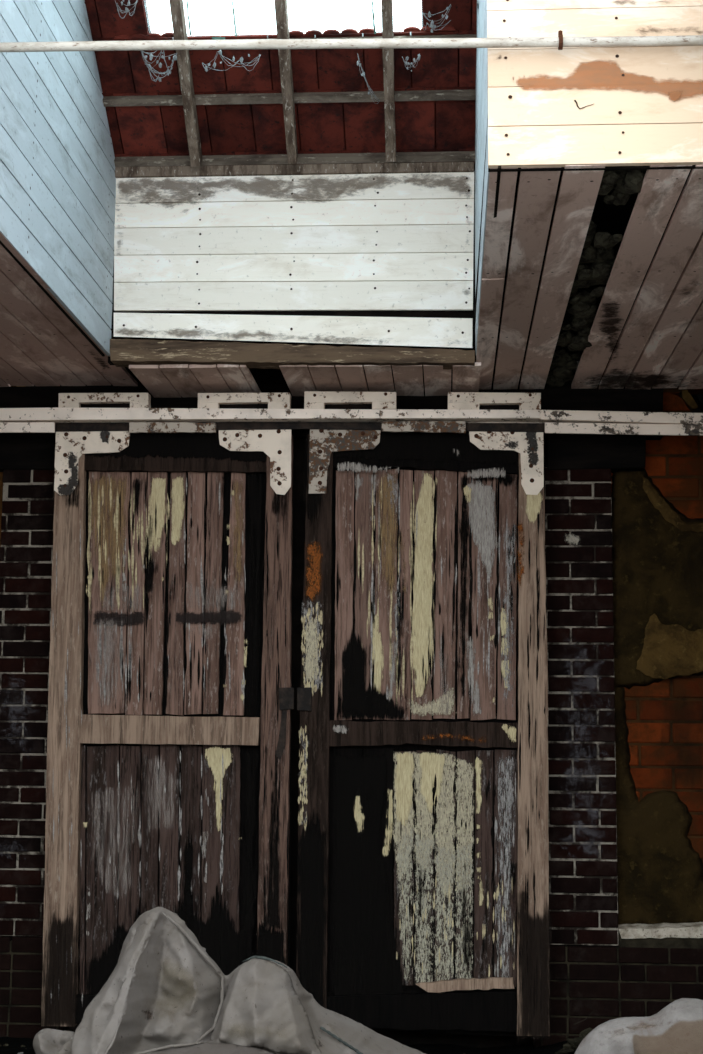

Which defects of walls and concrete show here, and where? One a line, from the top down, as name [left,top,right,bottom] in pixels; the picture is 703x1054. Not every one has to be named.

peeling [58,452,78,496]
peeling [86,475,141,706]
peeling [150,477,185,551]
peeling [188,480,243,609]
peeling [502,724,516,742]
peeling [354,796,364,832]
peeling [382,752,484,983]
peeling [495,756,517,977]
spalling [615,687,703,925]